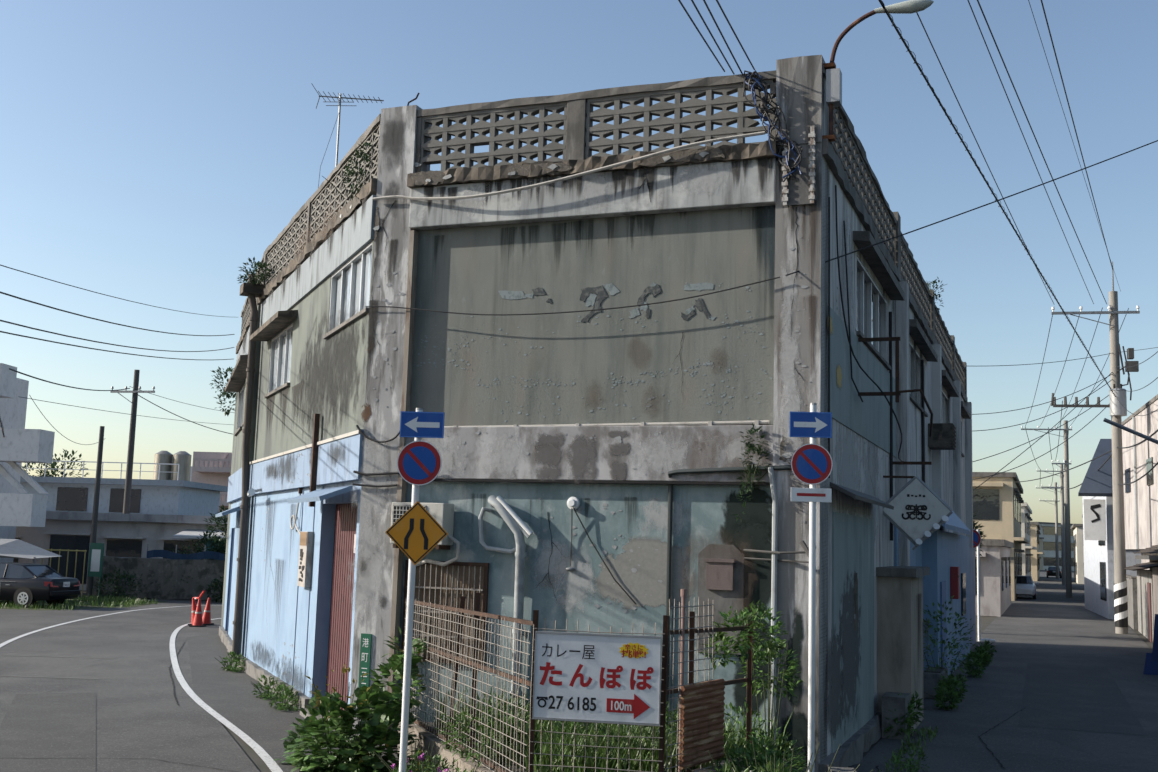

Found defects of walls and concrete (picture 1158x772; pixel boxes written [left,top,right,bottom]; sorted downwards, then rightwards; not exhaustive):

water stain [424,186,457,210]
water stain [485,174,582,201]
water stain [611,167,655,195]
water stain [376,219,398,271]
peeling [577,283,657,331]
water stain [266,300,378,431]
water stain [267,458,291,478]
water stain [534,431,630,482]